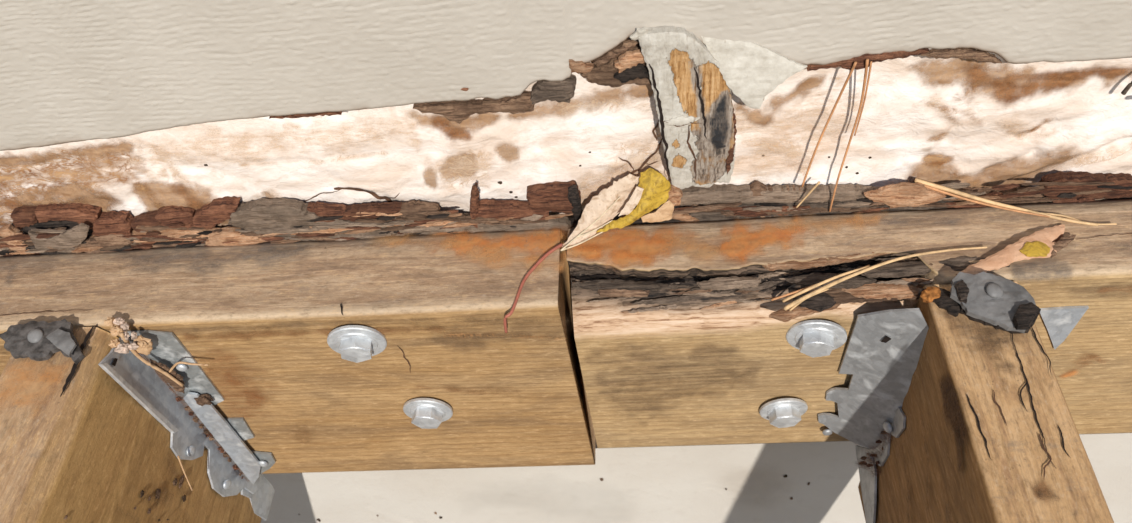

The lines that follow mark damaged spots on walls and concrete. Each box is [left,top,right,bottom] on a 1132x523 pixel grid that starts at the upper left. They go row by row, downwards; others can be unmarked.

leakage [395,85,654,142]
peeling [638,26,807,189]
leakage [737,77,839,173]
leakage [913,58,1132,118]
leakage [0,141,214,229]
leakage [424,144,518,188]
leakage [908,151,1098,188]
peeling [28,223,90,251]
rust [446,230,562,265]
rust [570,219,801,264]
crack [0,309,94,397]
crack [966,326,1070,477]